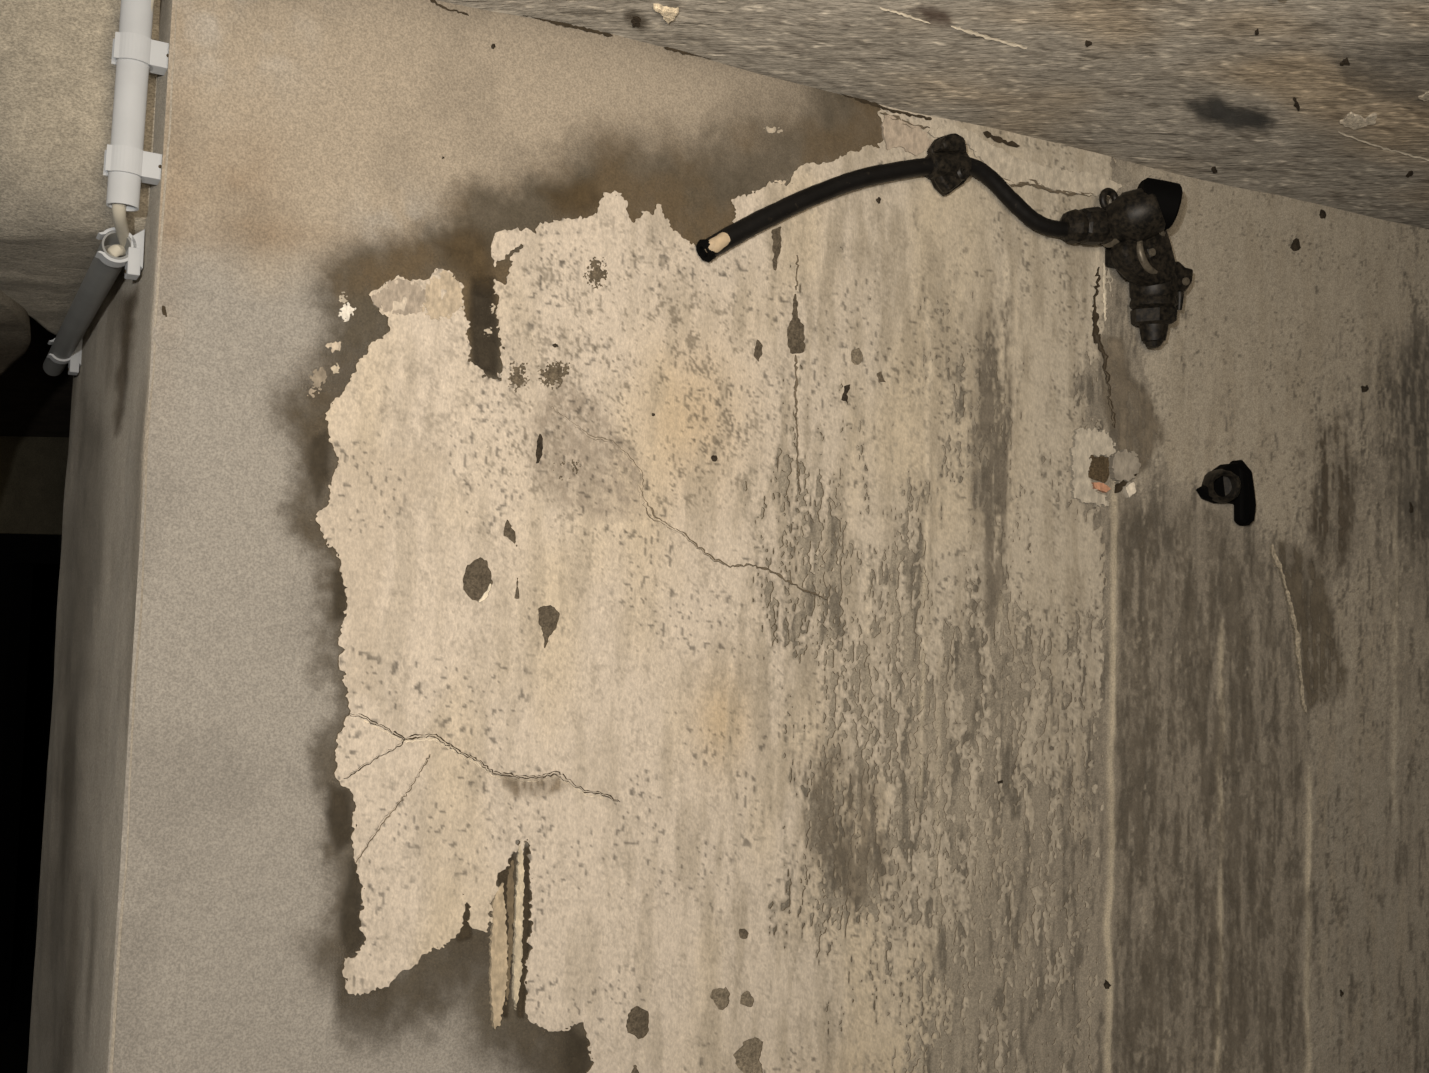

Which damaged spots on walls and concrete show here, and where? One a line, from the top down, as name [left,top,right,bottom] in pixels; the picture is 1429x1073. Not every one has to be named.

crack [552,406,827,600]
peeling [307,104,1122,1073]
damp [1391,347,1429,537]
crack [344,714,620,864]